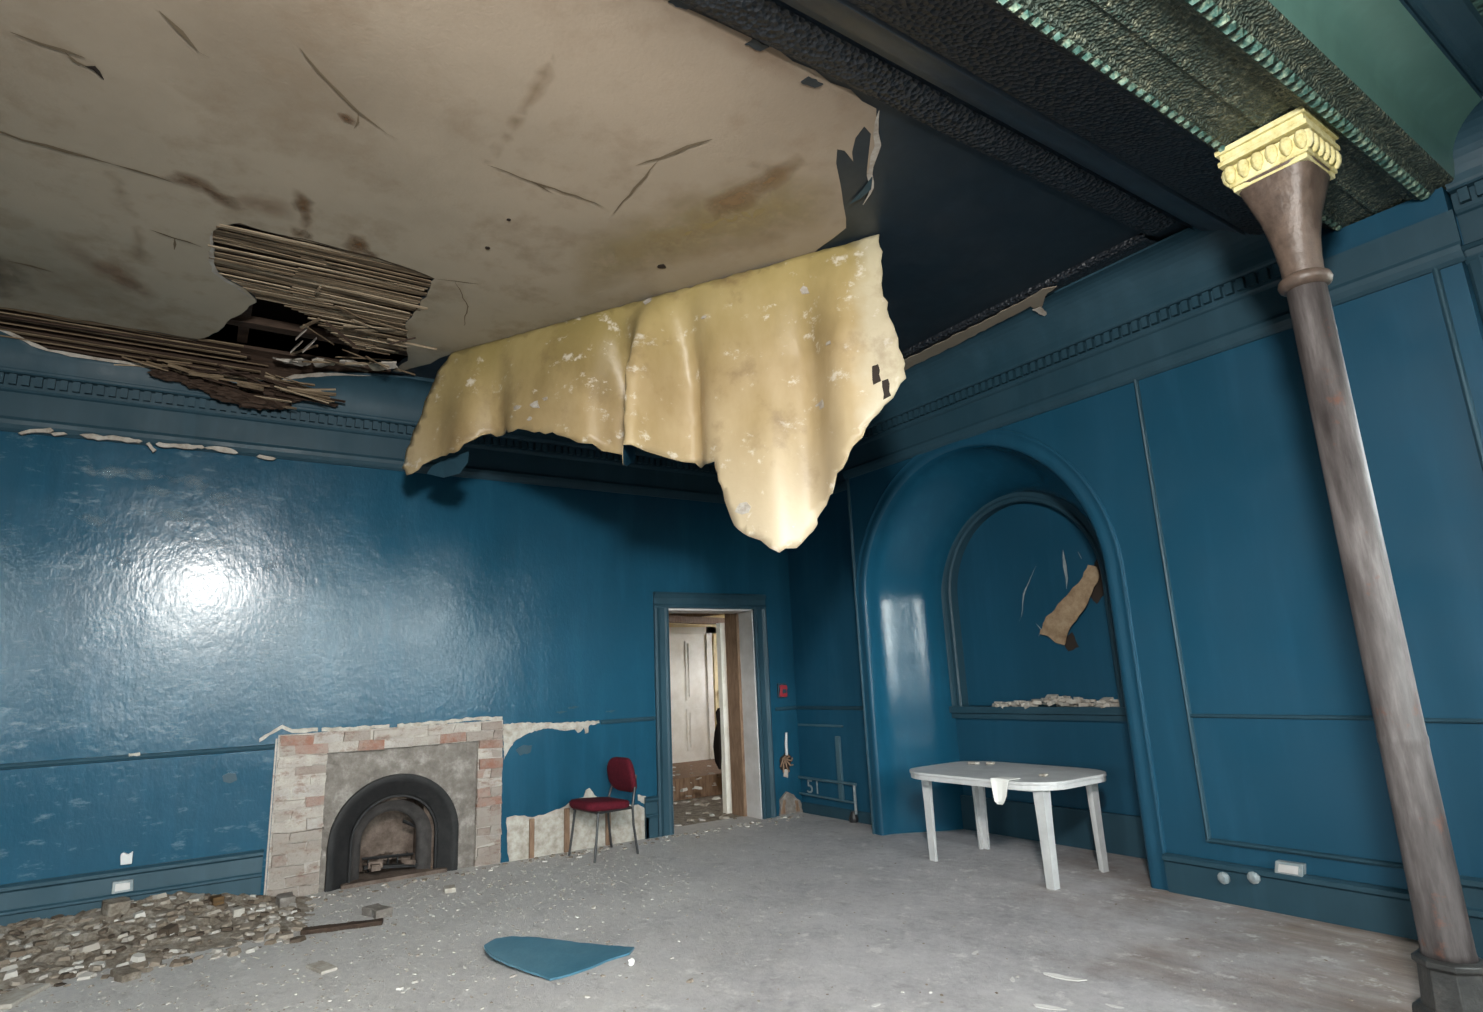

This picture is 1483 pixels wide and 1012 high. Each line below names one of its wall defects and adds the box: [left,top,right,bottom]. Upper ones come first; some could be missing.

peeling [0,0,1057,553]
peeling [506,788,649,862]